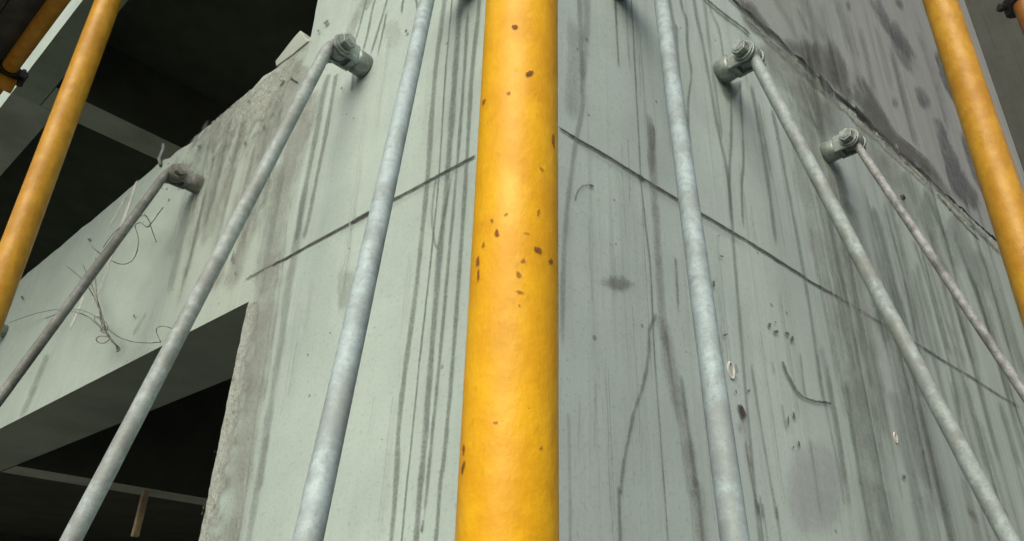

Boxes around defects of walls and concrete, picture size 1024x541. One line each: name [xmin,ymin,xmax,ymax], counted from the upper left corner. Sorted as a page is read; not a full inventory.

leakage [871,0,915,63]
leakage [273,77,336,235]
leakage [712,82,776,250]
leakage [787,39,979,206]
leakage [618,136,663,540]
crack [782,361,831,404]